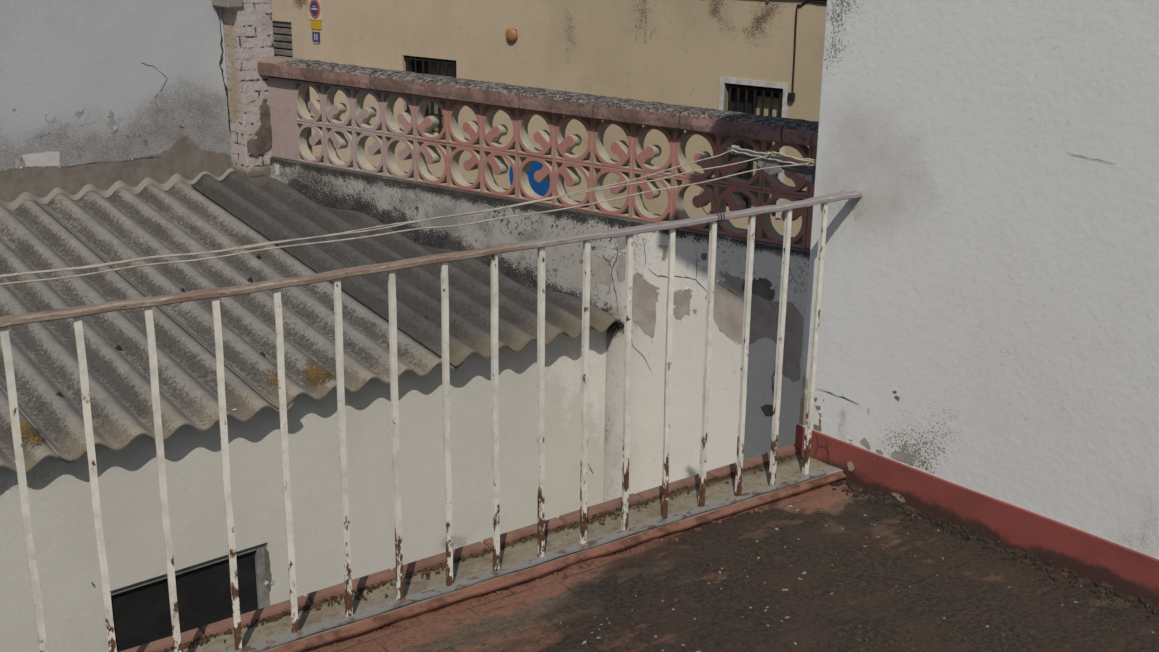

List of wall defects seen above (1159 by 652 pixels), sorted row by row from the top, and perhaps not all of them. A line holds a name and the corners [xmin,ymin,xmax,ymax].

leakage [706,0,786,48]
peeling [0,110,232,202]
leakage [0,8,244,171]
spalling [247,95,272,156]
leakage [813,0,963,281]
leakage [270,159,810,452]
peeling [591,236,660,342]
peeling [673,286,697,321]
peeling [713,269,803,382]
leakage [877,402,964,474]